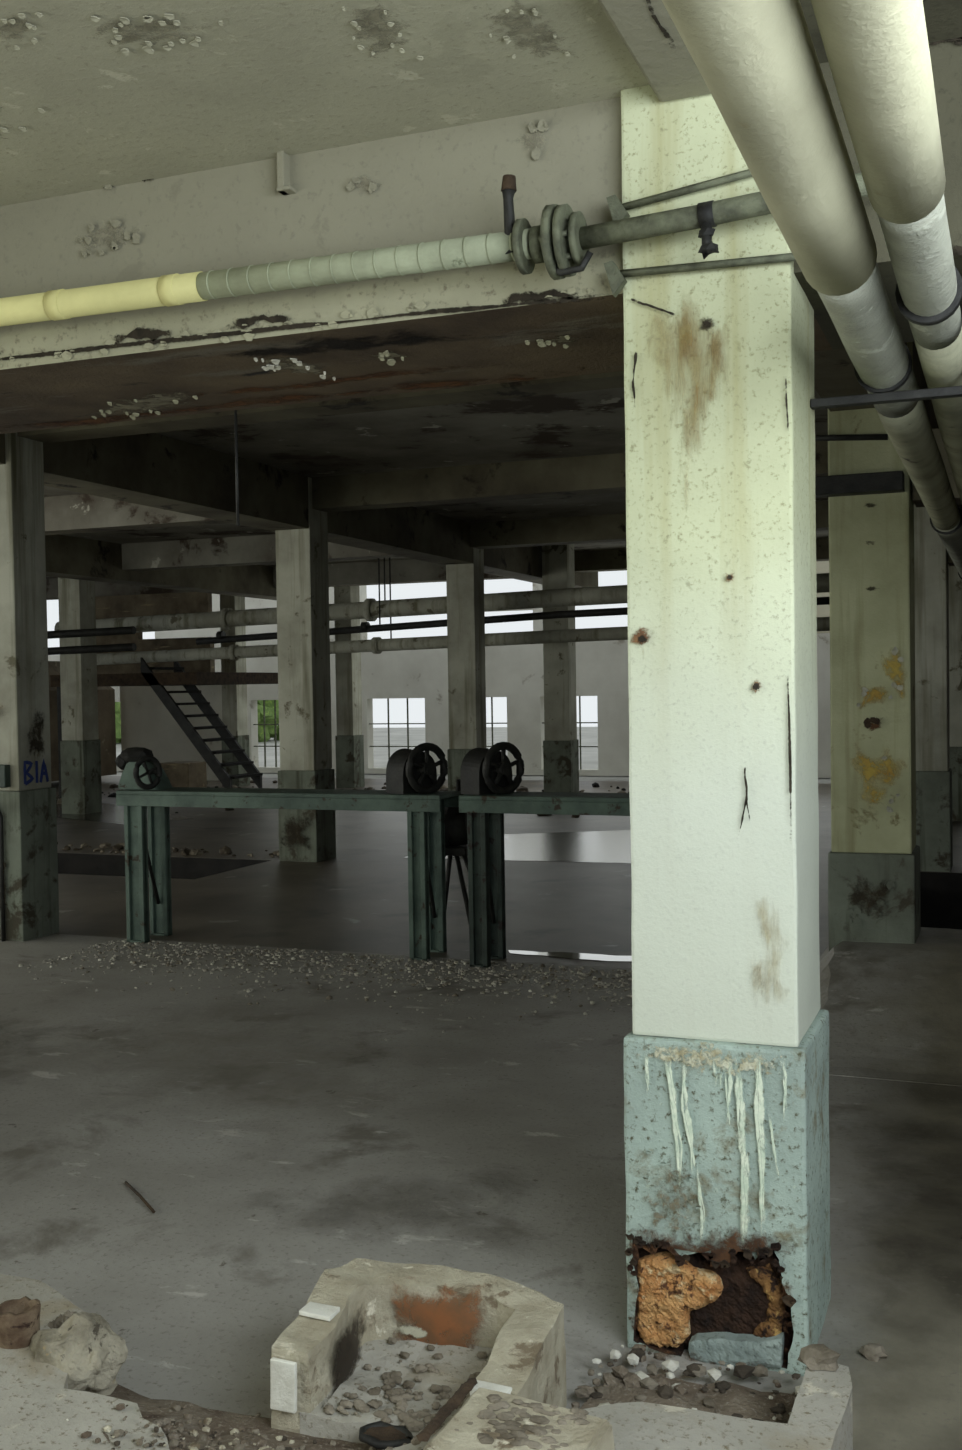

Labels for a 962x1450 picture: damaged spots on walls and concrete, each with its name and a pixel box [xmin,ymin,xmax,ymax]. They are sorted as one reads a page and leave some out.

peeling [0,12,43,50]
peeling [90,13,201,55]
peeling [342,7,424,60]
peeling [489,3,570,59]
crack [930,37,962,45]
spalling [0,288,604,368]
rust [700,319,714,330]
peeling [254,358,335,381]
efflorescence [638,1042,787,1241]
spalling [624,1150,796,1368]